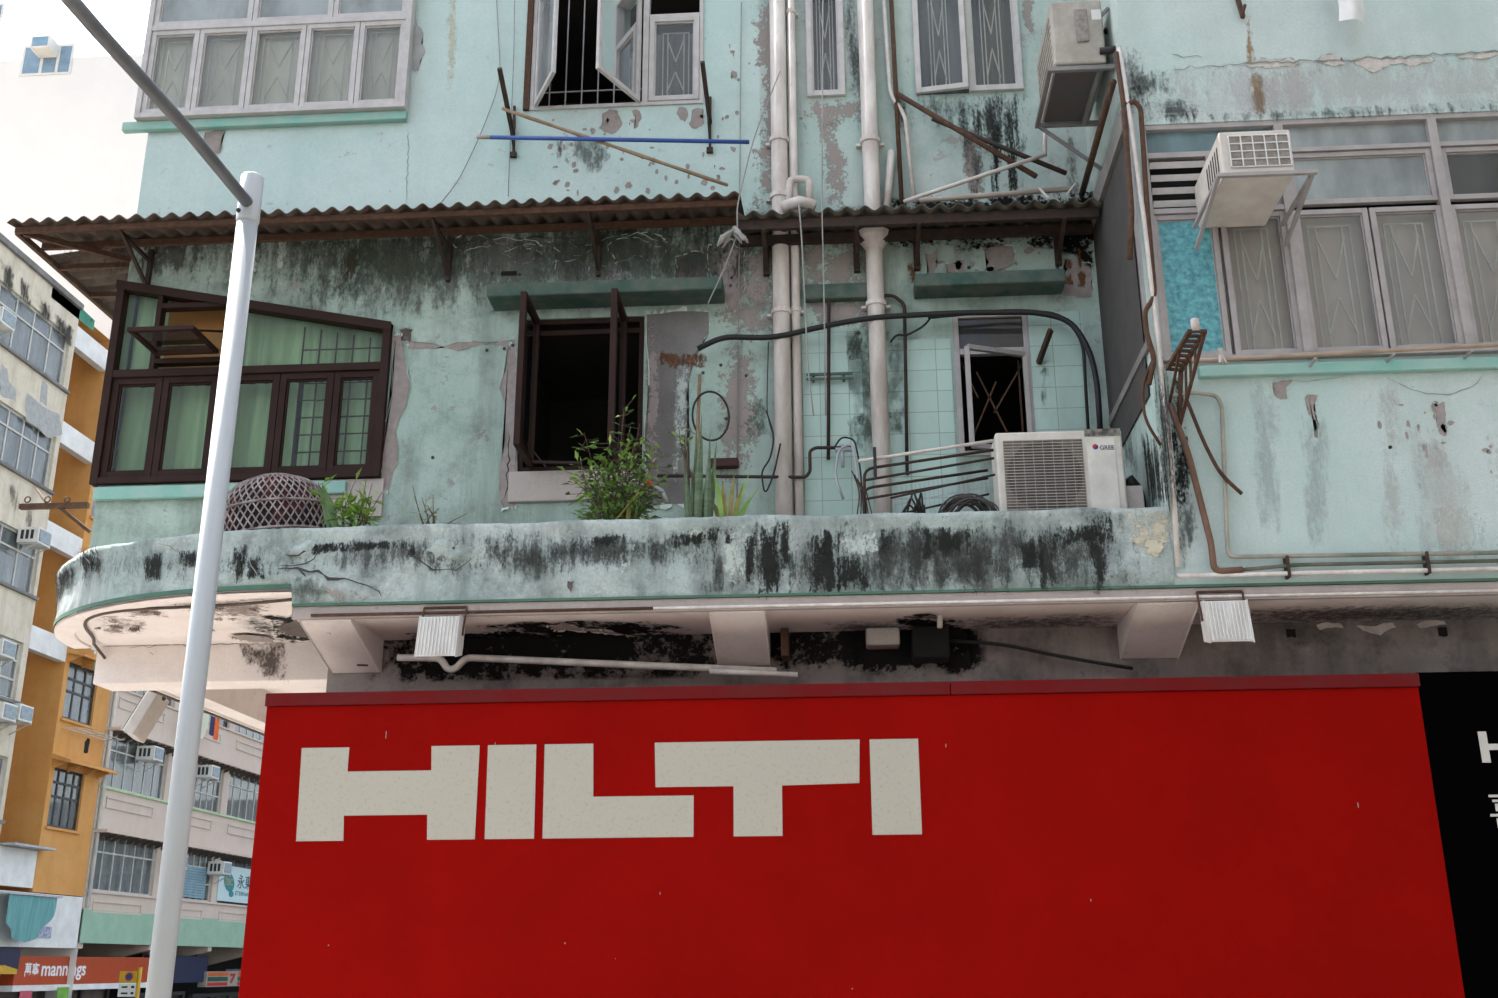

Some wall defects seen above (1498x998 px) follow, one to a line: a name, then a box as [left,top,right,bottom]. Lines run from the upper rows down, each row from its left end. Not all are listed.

corrosion [1247,30,1265,114]
flaking render [1318,53,1435,73]
peeling [547,109,725,196]
peeling [677,107,739,152]
leakage [891,99,1093,209]
leakage [104,244,233,285]
leakage [888,223,1094,268]
leakage [253,225,773,483]
leakage [480,369,1193,598]
leakage [55,548,197,612]
leakage [223,545,278,583]
leakage [300,538,464,604]